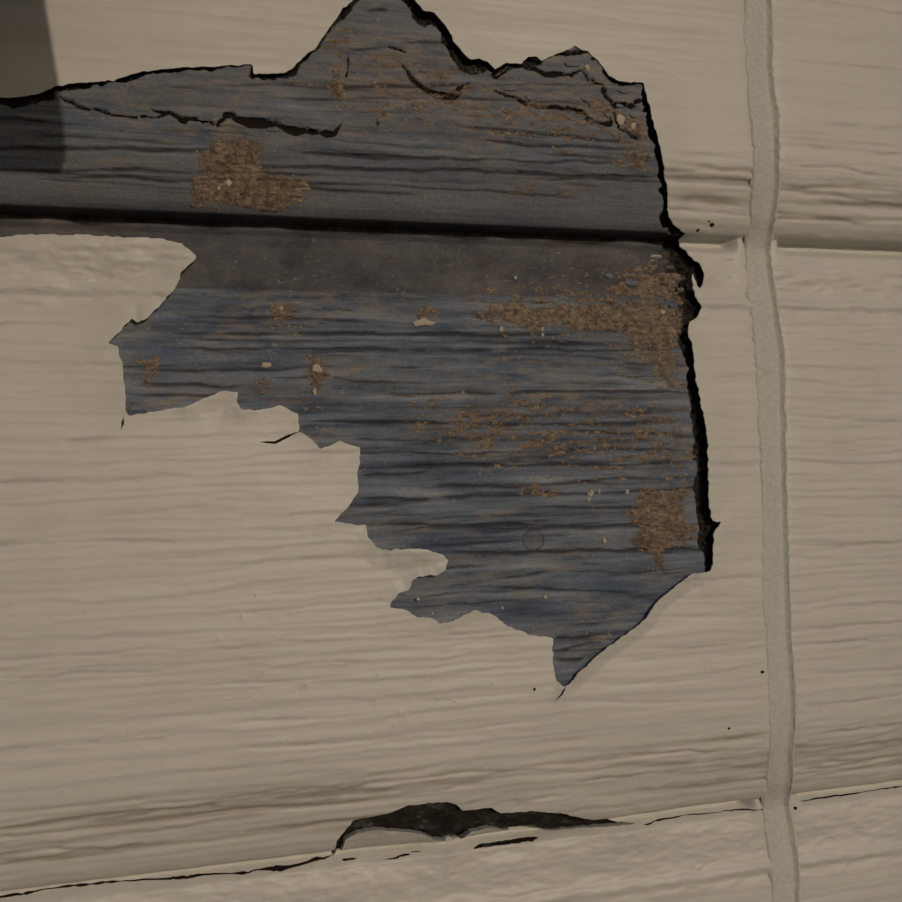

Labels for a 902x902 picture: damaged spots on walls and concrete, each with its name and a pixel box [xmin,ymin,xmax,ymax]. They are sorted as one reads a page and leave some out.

peeling [0,0,721,687]
crack [469,825,540,850]
crack [644,809,763,825]
crack [0,855,357,898]